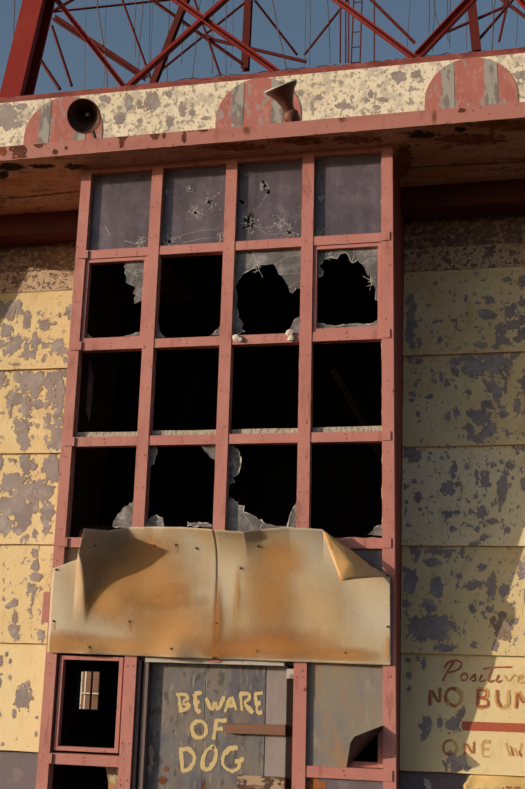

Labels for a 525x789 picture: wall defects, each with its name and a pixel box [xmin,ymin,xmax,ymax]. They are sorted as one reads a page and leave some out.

peeling [0,103,27,131]
peeling [113,90,173,125]
peeling [149,101,209,143]
peeling [433,275,525,444]
peeling [0,299,72,641]
peeling [437,459,515,534]
rust [49,536,202,656]
rust [208,545,366,659]
peeling [403,547,465,653]
peeling [450,563,525,652]
rust [306,777,326,789]